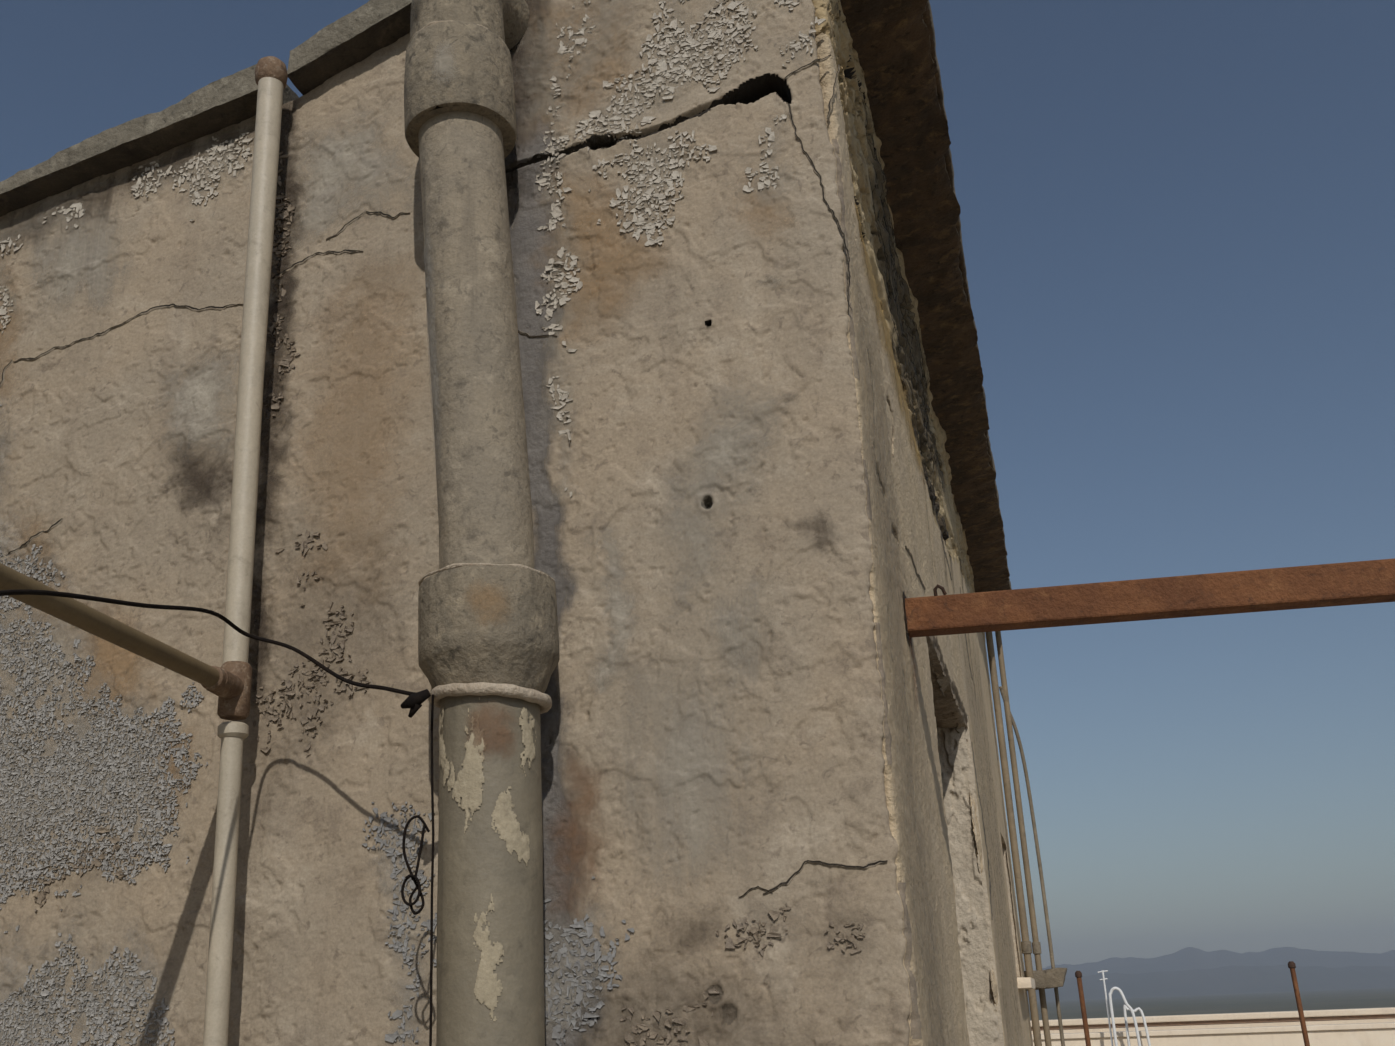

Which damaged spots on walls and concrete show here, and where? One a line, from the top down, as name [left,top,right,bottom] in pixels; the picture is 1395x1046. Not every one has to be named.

damp [36,227,108,305]
crack [0,303,243,387]
damp [168,356,234,441]
crack [271,211,410,281]
damp [504,30,575,627]
crack [505,54,867,312]
peeling [0,596,208,911]
peeling [439,697,530,866]
damp [540,674,600,1046]
crack [739,859,888,897]
peeling [0,933,175,1046]
peeling [543,899,635,1046]